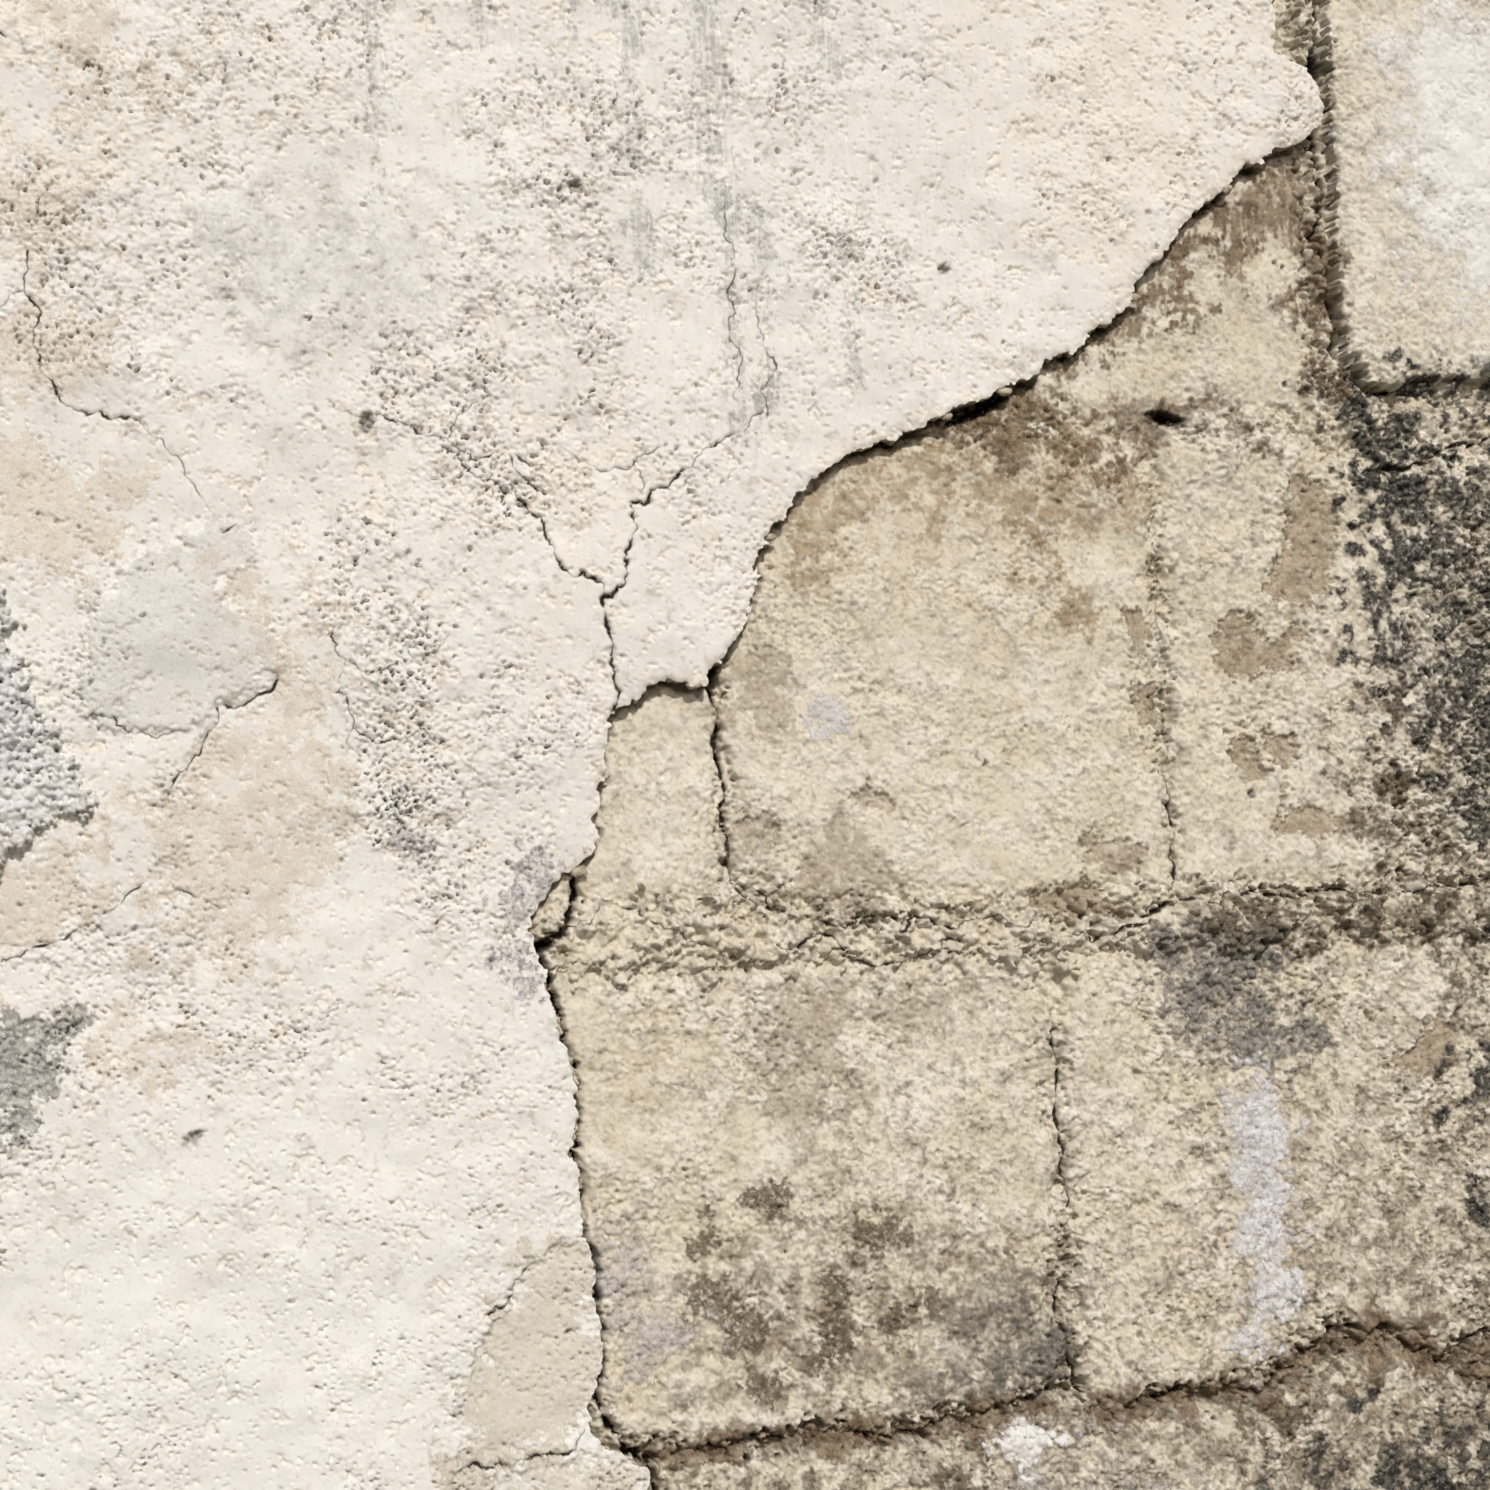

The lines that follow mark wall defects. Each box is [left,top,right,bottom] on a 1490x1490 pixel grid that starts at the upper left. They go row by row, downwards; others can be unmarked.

spalling [753,128,1316,577]
crack [372,403,681,711]
spalling [1208,467,1342,684]
peeling [0,1004,94,1153]
peeling [0,586,100,884]
damp [478,837,564,1005]
crack [534,876,734,1198]
damp [739,1177,792,1221]
crack [780,788,1490,967]
damp [937,158,1490,1490]
damp [589,1201,1061,1490]
crack [459,1245,1486,1490]